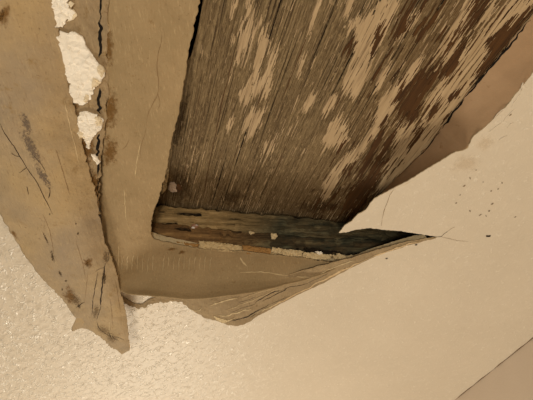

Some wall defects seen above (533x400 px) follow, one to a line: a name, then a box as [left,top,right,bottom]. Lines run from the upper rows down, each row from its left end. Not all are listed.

crack [96,0,104,56]
crack [95,89,103,113]
water stain [105,98,117,126]
peeling [219,0,533,222]
crack [94,135,102,198]
peeling [0,0,435,354]